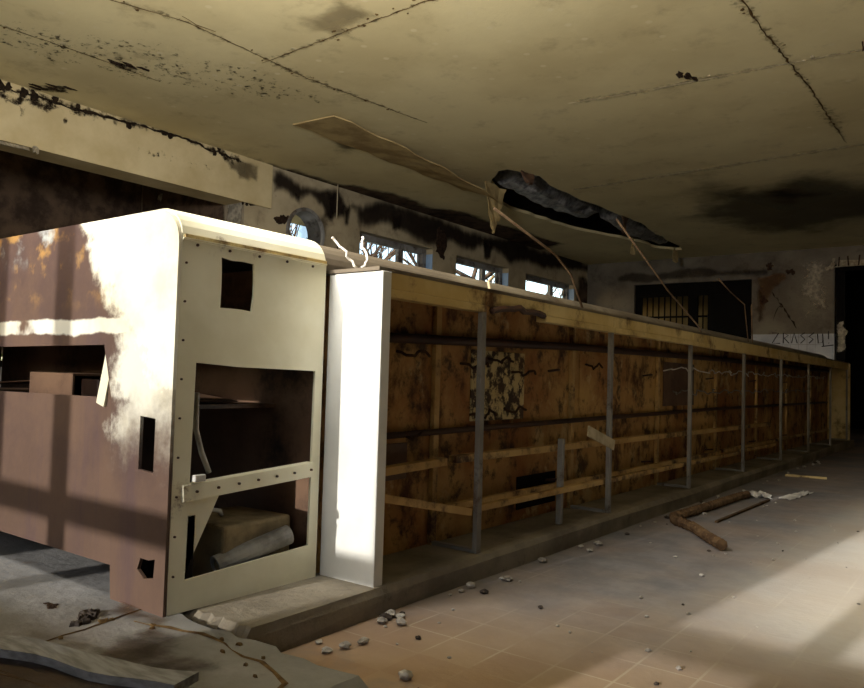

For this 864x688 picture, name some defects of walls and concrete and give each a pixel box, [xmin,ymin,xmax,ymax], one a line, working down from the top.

crack [111,0,434,122]
crack [568,0,861,143]
crack [0,79,246,164]
peeling [227,203,242,224]
peeling [785,258,864,307]